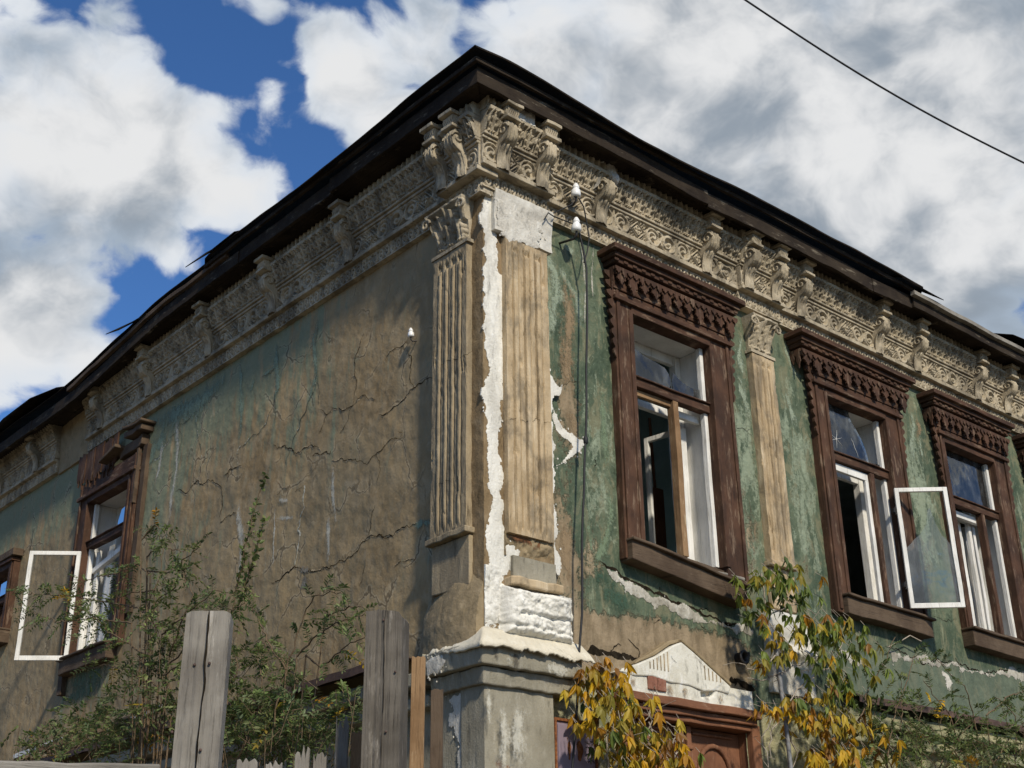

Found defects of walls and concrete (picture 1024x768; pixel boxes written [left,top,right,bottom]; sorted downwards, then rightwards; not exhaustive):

crack [150,327,470,522]
crack [272,485,430,584]
flaking render [478,194,546,628]
flaking render [550,369,584,576]
spalling [607,569,754,636]
spalling [889,651,1024,691]